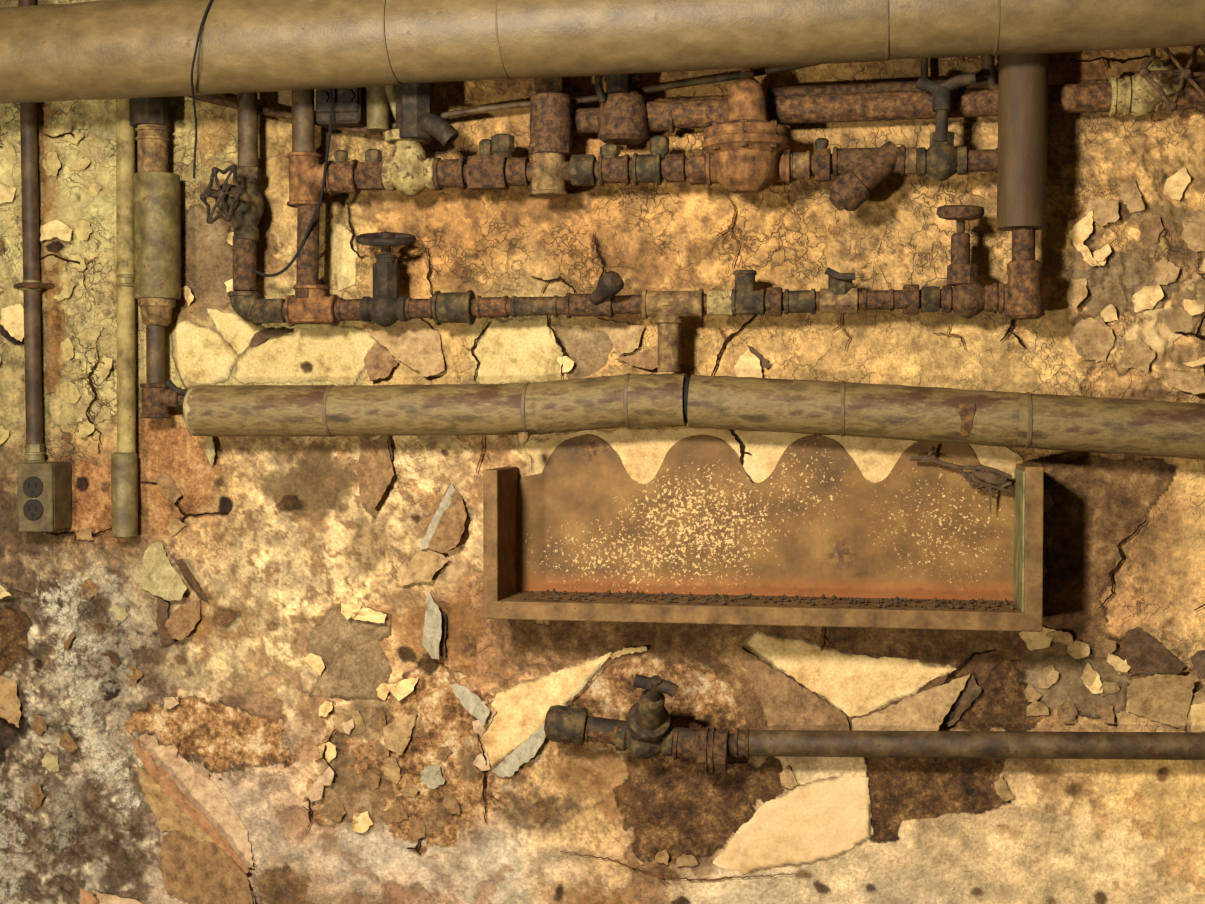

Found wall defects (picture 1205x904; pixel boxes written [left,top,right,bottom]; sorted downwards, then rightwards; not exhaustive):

crack [44,125,75,138]
peeling [1163,167,1191,200]
crack [40,254,98,286]
peeling [1062,180,1205,395]
crack [77,327,107,454]
crack [1099,518,1147,608]
flaking render [0,585,79,810]
peeling [100,650,143,701]
flaking render [303,483,799,879]
flaking render [124,694,311,904]
peeling [80,889,143,904]
spalling [554,884,563,901]